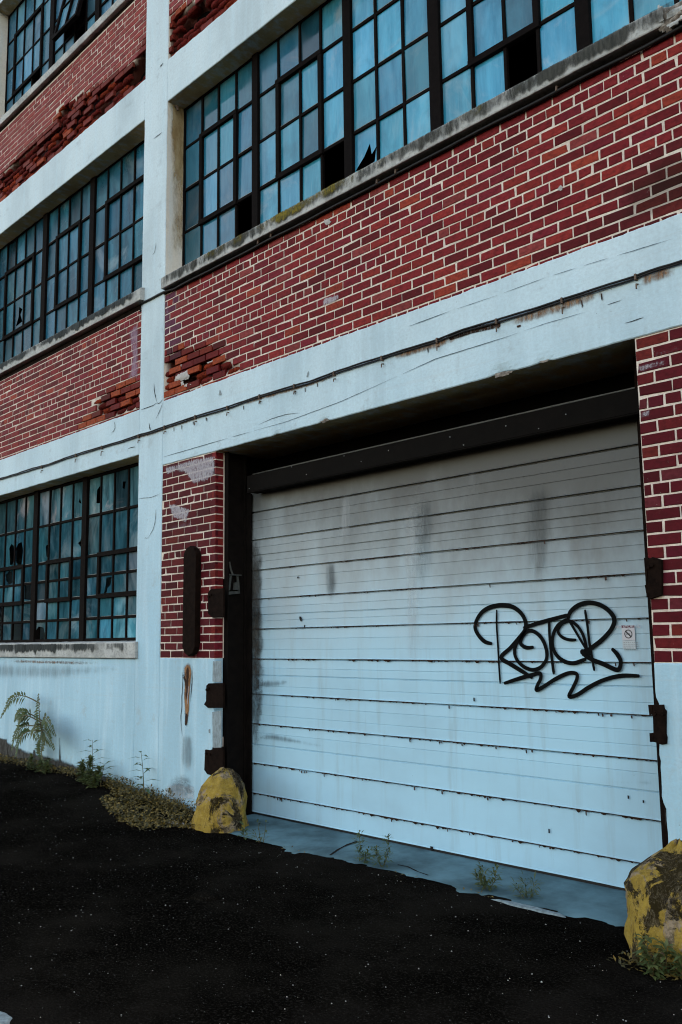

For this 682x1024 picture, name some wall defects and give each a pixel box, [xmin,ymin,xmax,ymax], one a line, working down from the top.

spalling [170,0,237,57]
spalling [2,74,146,196]
spalling [165,360,240,392]
spalling [94,395,140,415]
rust [180,665,192,731]
rust [279,695,429,705]
rust [443,704,652,718]
rust [253,723,657,762]
rust [253,763,661,822]
rust [253,793,640,864]